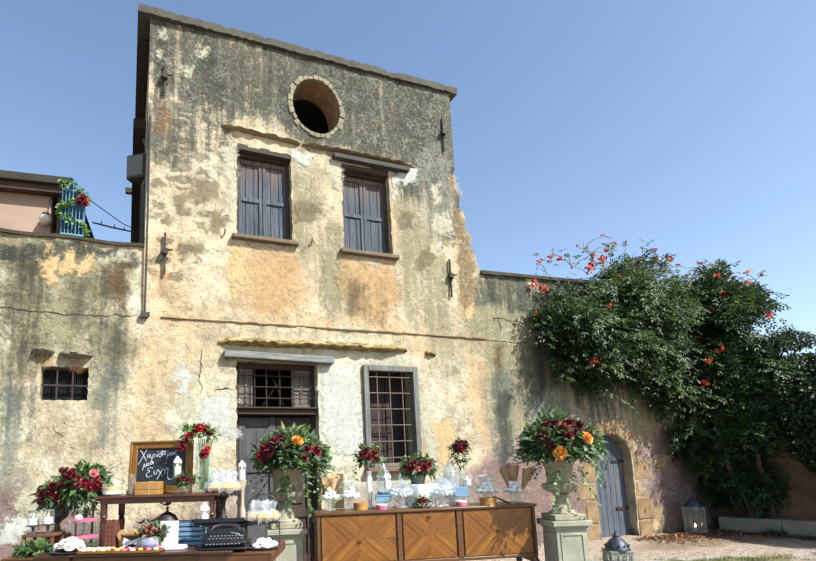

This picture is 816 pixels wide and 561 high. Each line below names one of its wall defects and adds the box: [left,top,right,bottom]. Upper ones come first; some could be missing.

flaking render [325,159,344,192]
flaking render [391,163,418,199]
water stain [4,247,39,332]
crack [0,306,132,319]
flaking render [417,183,480,320]
crack [482,316,536,344]
water stain [7,337,32,418]
water stain [494,346,511,462]
water stain [517,346,550,408]
flaking render [0,485,100,561]